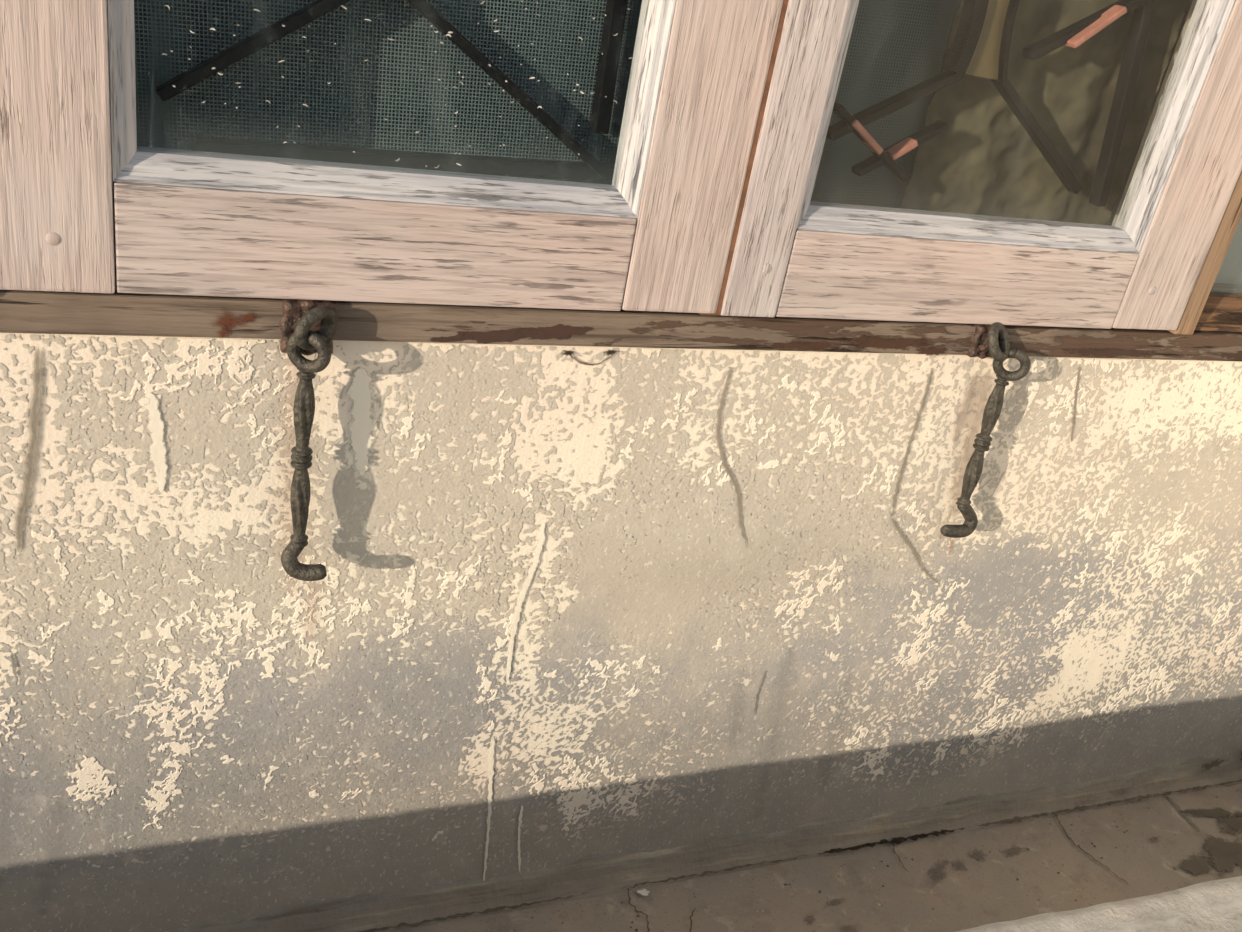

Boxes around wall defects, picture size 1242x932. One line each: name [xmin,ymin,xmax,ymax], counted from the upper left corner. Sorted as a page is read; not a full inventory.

corrosion [217,312,256,337]
crack [15,349,42,550]
crack [717,368,747,548]
crack [891,370,937,582]
peeling [0,334,1242,932]
crack [623,780,1242,932]
water stain [1173,808,1242,876]